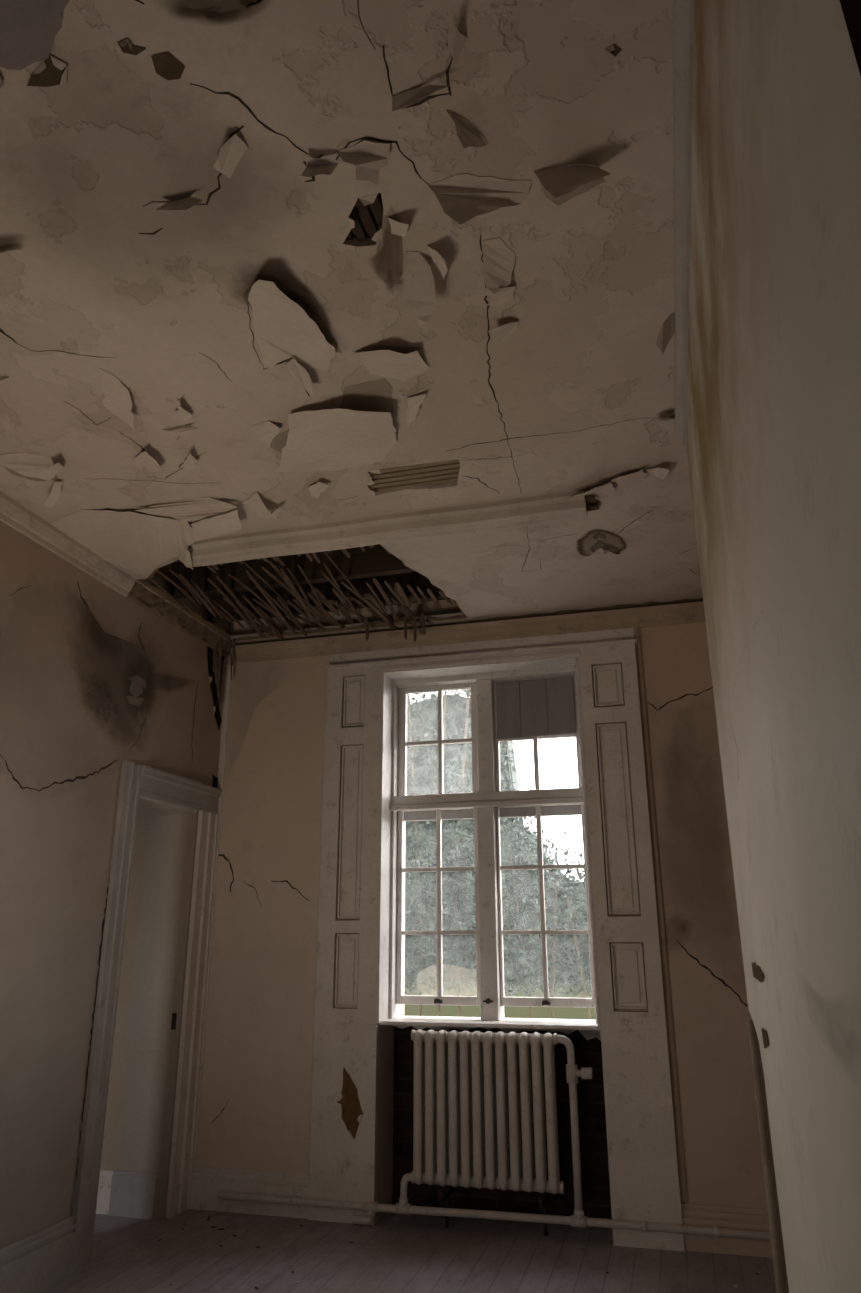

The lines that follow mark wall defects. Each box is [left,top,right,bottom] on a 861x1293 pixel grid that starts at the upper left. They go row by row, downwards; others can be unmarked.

peeling [0,0,69,88]
spalling [117,38,185,80]
crack [357,0,453,109]
crack [190,83,429,185]
crack [139,173,222,235]
peeling [242,274,460,498]
crack [447,234,675,494]
peeling [0,451,281,577]
peeling [567,467,670,500]
crack [0,623,154,792]
crack [676,939,748,1007]
peeling [337,1068,364,1139]